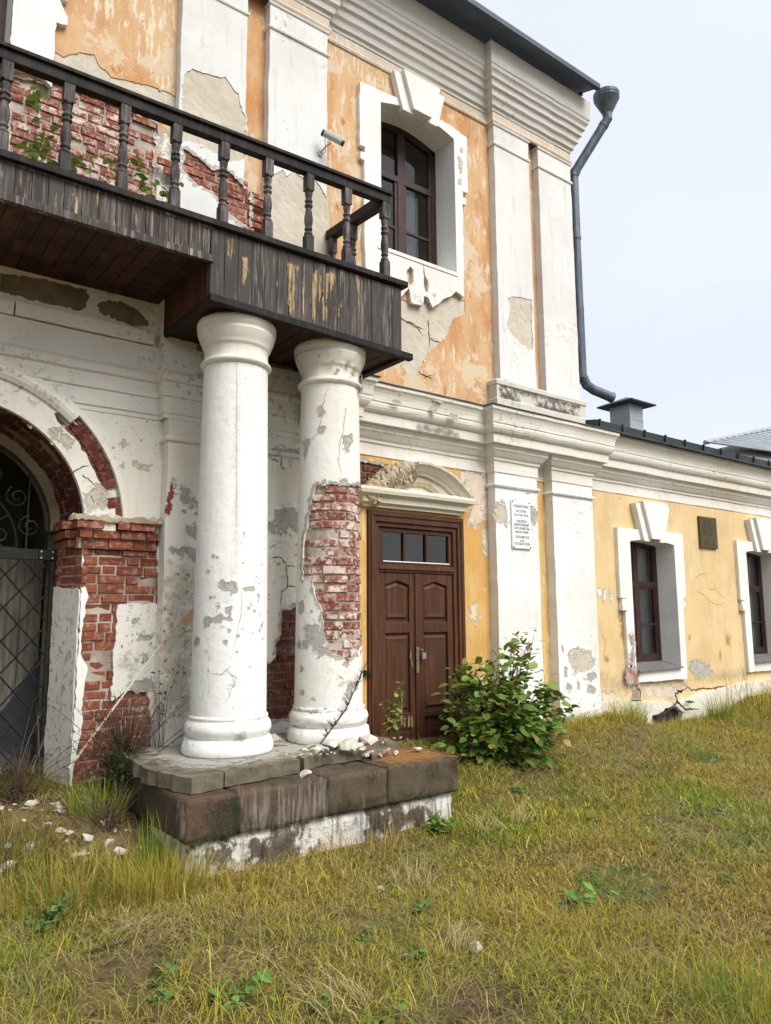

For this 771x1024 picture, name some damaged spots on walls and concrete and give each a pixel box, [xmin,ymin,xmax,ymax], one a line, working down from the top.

flaking render [54,52,249,136]
spalling [0,74,329,256]
flaking render [0,273,148,327]
flaking render [400,297,465,376]
flaking render [506,296,534,350]
spalling [47,415,159,532]
flaking render [268,405,327,469]
crack [272,394,346,476]
flaking render [454,469,510,557]
spalling [75,433,385,792]
flaking render [560,631,684,715]
crack [632,684,730,716]